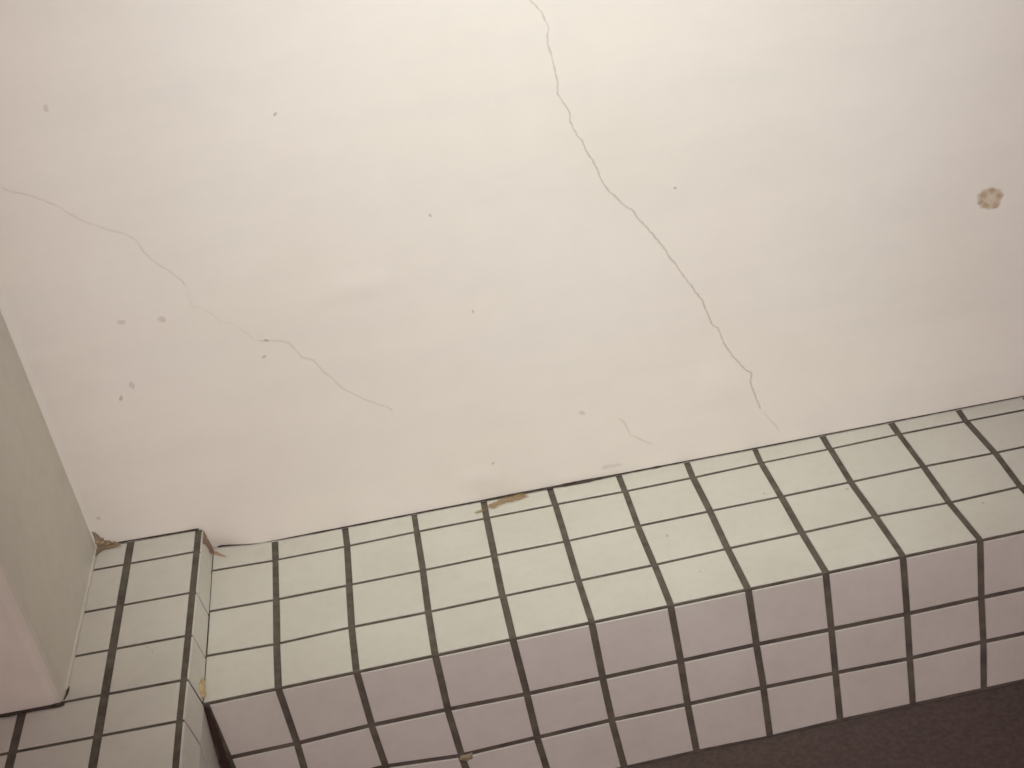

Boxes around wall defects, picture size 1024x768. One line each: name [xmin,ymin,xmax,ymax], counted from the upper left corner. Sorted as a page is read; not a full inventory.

spalling [92,532,121,556]